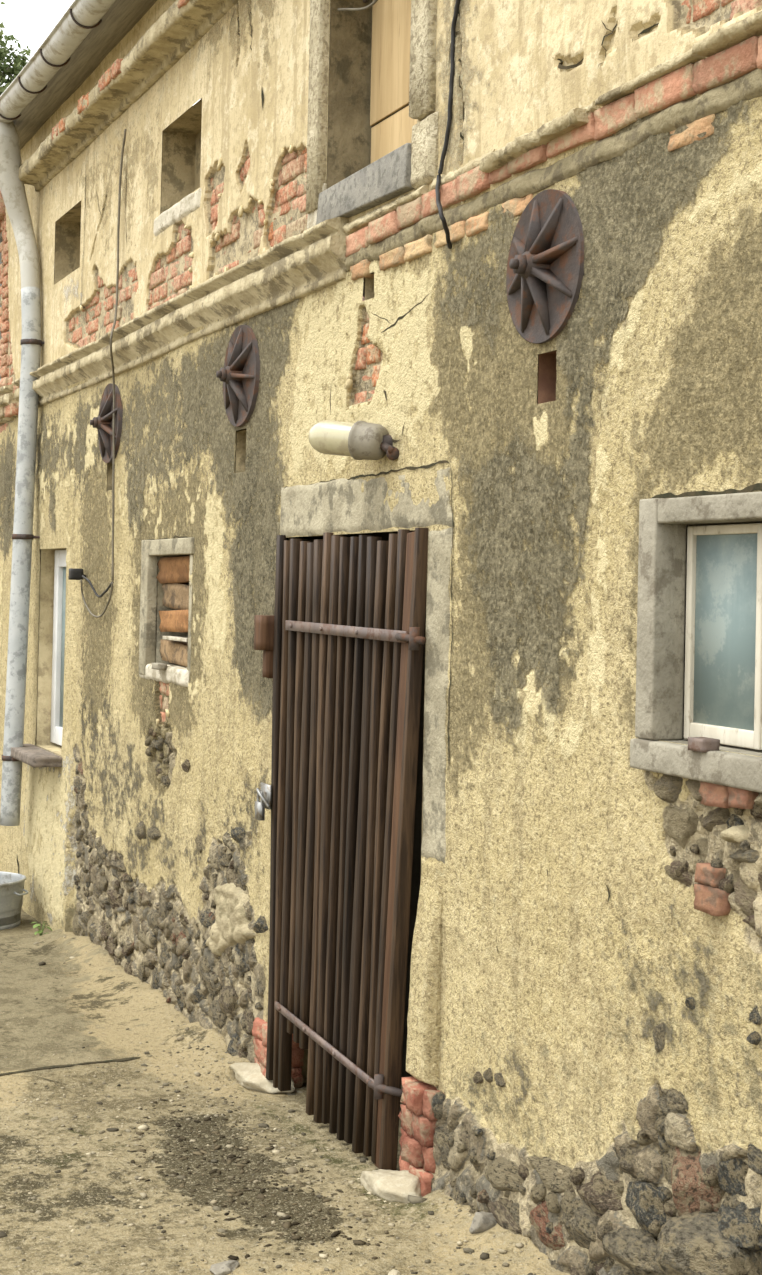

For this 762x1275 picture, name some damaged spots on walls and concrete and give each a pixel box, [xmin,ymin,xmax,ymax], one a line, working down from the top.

flaking render [681,0,762,24]
flaking render [209,145,308,273]
flaking render [68,223,194,347]
flaking render [345,312,383,405]